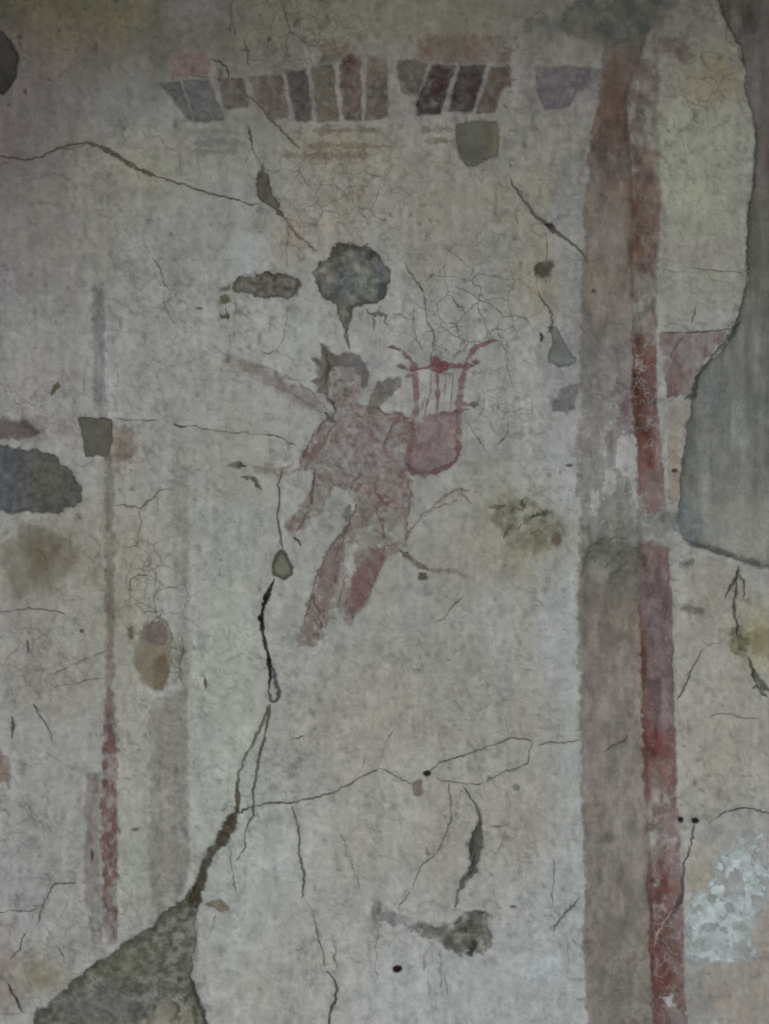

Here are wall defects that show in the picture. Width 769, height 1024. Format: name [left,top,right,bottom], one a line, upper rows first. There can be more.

crack [0,141,254,205]
flaking render [232,270,301,300]
flaking render [312,243,390,350]
crack [510,178,586,258]
flaking render [677,0,769,566]
crack [725,566,769,697]
crack [185,578,577,908]
flaking render [33,887,229,1024]
crack [316,925,338,1024]
damp [664,981,711,1024]
crack [654,807,769,946]
damp [686,830,769,964]